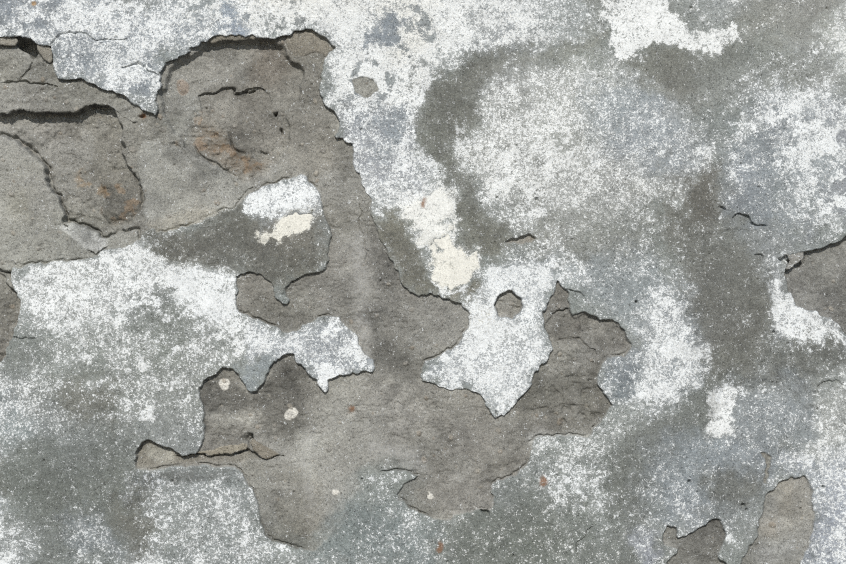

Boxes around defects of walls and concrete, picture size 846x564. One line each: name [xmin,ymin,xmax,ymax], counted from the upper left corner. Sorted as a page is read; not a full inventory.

crack [198,86,267,96]
flaking render [0,27,707,553]
flaking render [770,236,846,353]
peeling [704,384,740,438]
flaking render [661,518,729,564]
flaking render [740,451,817,564]